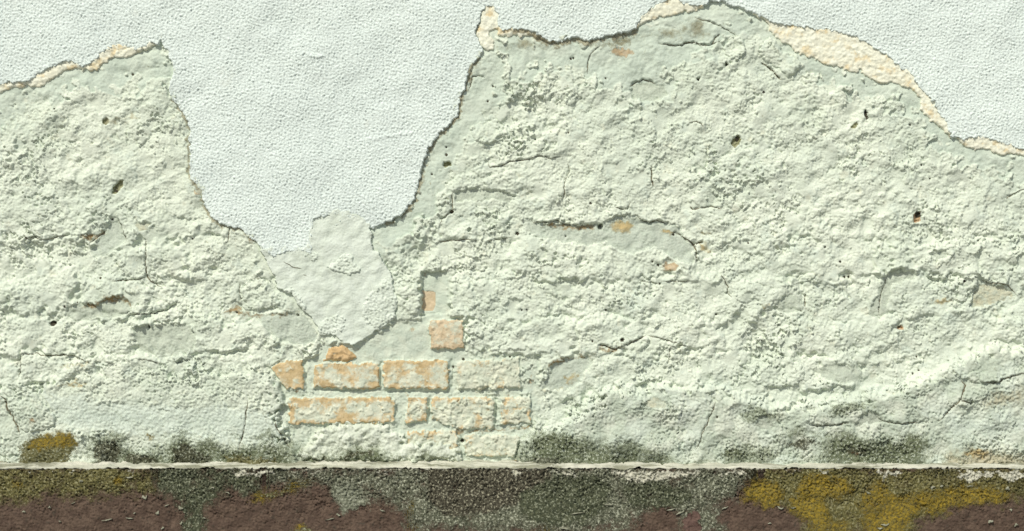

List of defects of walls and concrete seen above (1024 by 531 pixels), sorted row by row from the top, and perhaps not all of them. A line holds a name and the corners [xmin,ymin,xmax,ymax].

flaking render [476,6,555,51]
flaking render [0,42,156,93]
flaking render [753,13,1024,156]
crack [27,223,173,315]
spalling [91,220,126,257]
spalling [529,214,695,271]
crack [614,202,702,284]
spalling [868,268,915,317]
crack [19,352,88,374]
spalling [242,209,593,462]
crack [874,373,1024,424]
damp [86,426,1024,531]